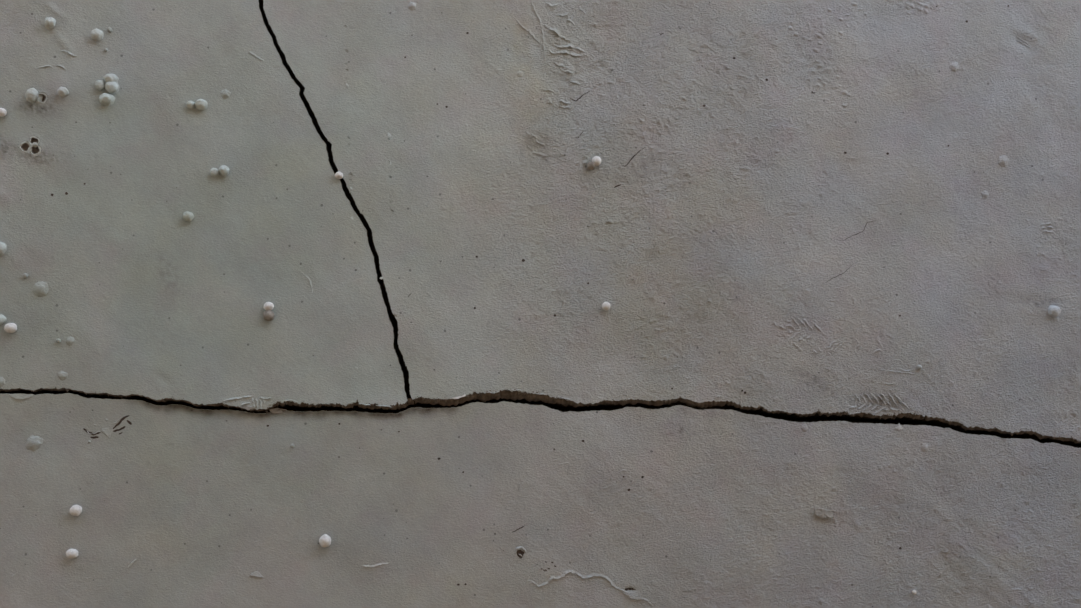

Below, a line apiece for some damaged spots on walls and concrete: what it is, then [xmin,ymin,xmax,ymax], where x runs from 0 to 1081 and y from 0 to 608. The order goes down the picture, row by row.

crack [0,0,1081,448]